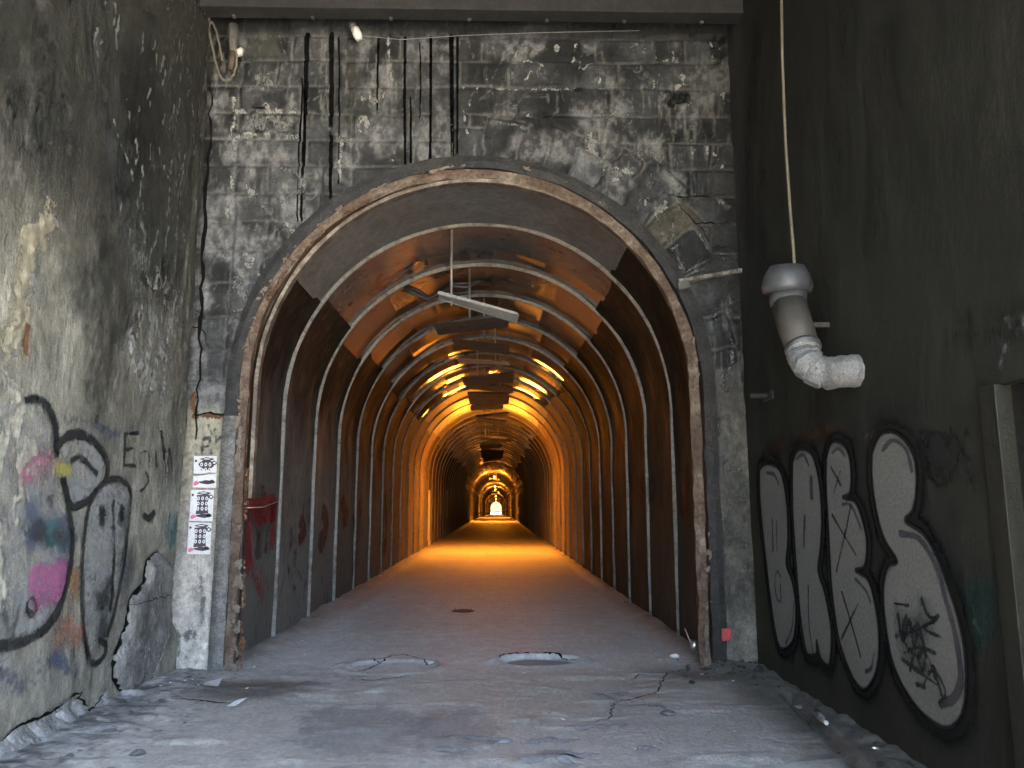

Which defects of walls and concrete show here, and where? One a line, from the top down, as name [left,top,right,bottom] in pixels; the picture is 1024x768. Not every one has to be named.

damp [328,32,433,199]
spalling [0,195,59,360]
crack [193,79,224,440]
crack [669,194,732,248]
crack [0,550,172,742]
crack [588,668,686,723]